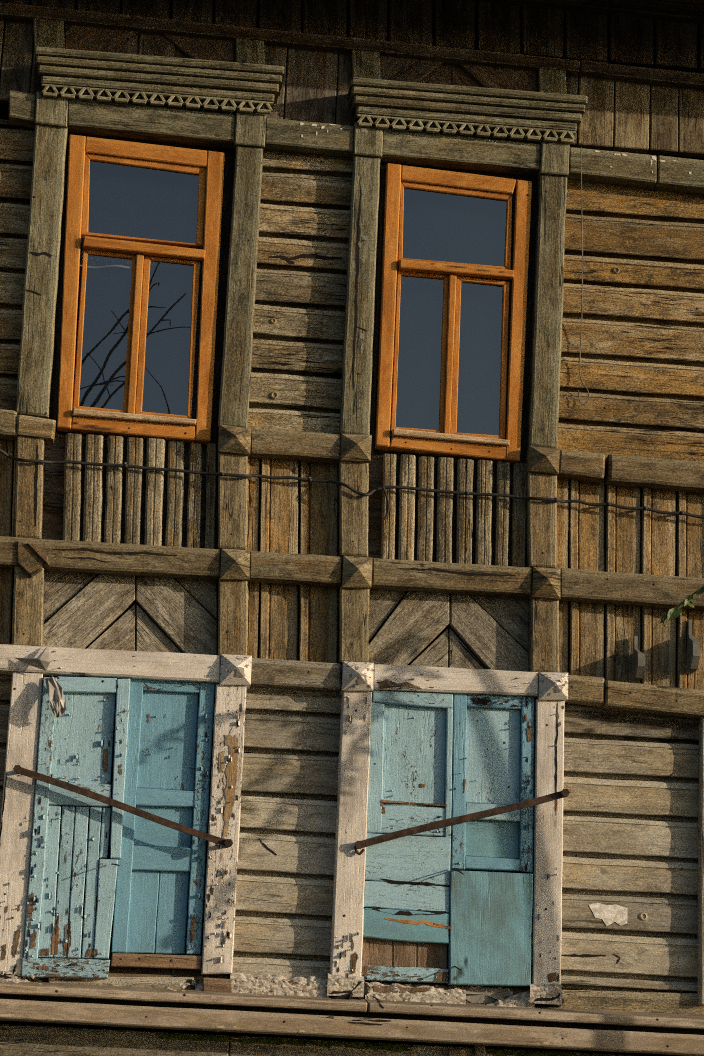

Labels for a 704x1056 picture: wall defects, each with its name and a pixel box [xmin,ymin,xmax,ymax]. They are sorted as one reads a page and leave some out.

peeling [94,708,127,784]
peeling [344,666,434,735]
peeling [471,697,533,749]
peeling [516,678,567,727]
peeling [190,703,242,966]
peeling [381,790,447,833]
peeling [0,797,107,984]